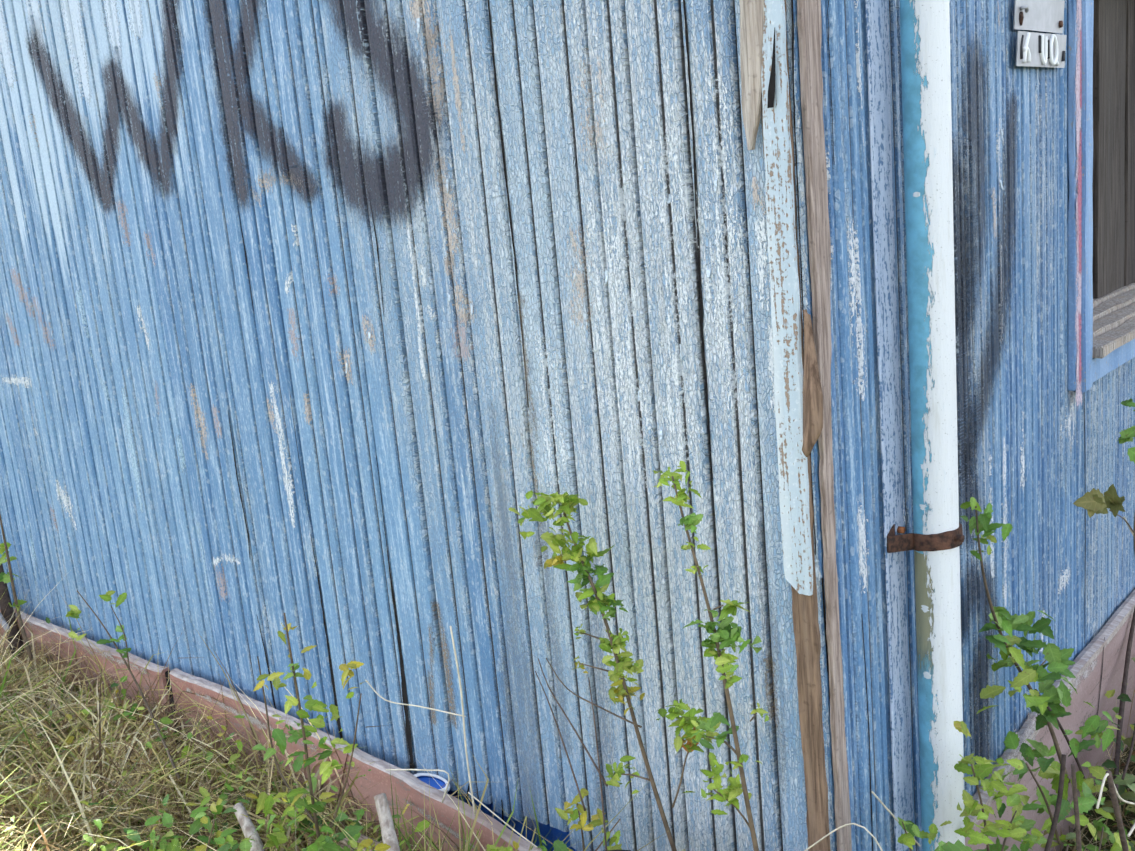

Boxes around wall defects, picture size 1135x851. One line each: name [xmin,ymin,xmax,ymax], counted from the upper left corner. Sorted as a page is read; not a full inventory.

peeling [854,0,864,150]
peeling [566,48,775,489]
peeling [847,218,868,401]
peeling [910,0,959,535]
crack [376,456,415,769]
peeling [525,330,573,559]
peeling [857,505,869,594]
peeling [921,546,965,851]
peeling [988,412,1025,606]
peeling [1058,562,1070,594]